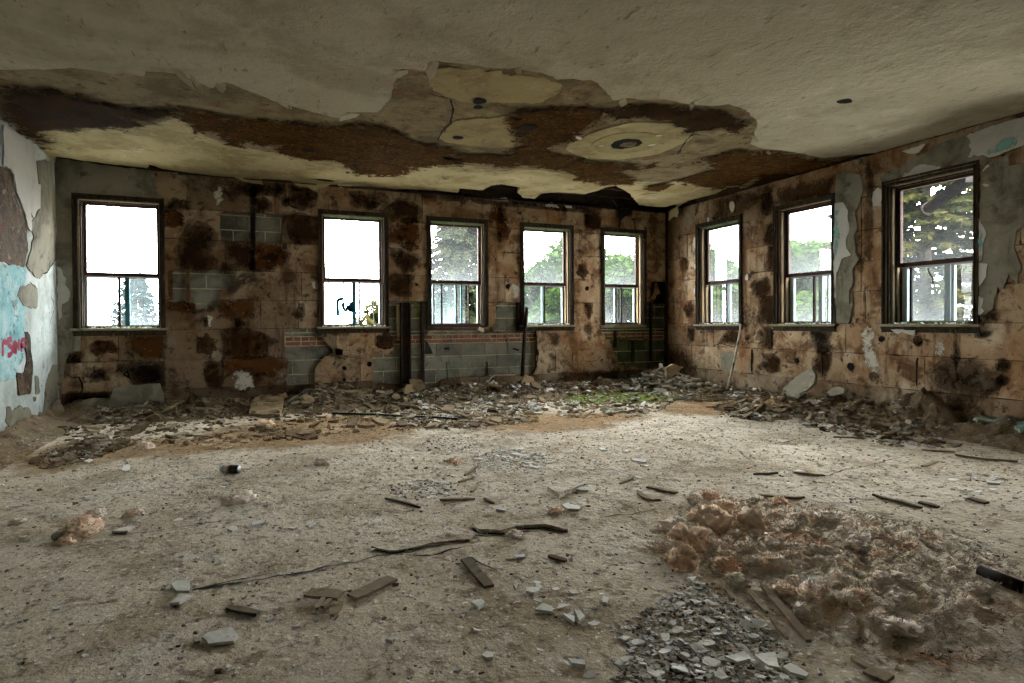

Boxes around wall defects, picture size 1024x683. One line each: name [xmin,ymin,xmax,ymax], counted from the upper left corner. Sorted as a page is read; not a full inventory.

water stain [165,179,318,273]
water stain [389,247,422,298]
spalling [0,60,864,427]
water stain [712,178,834,379]
peeling [872,117,1024,316]
water stain [925,333,1010,411]